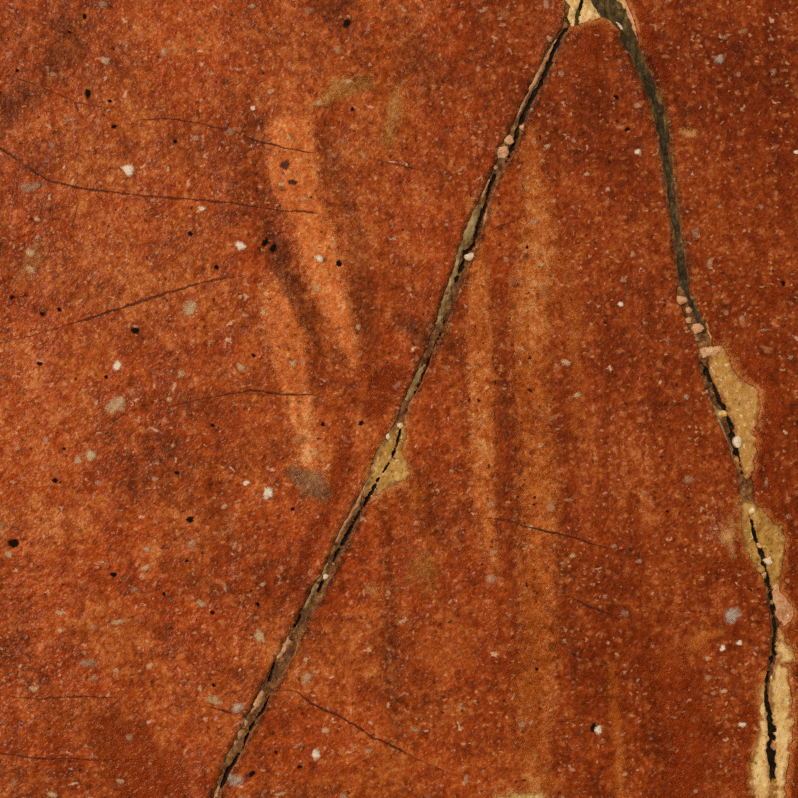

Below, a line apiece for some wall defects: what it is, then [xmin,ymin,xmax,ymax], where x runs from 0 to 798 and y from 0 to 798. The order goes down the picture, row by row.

crack [138,118,315,153]
crack [154,389,326,410]
rust [290,422,351,588]
flaking render [359,420,414,501]
crack [204,0,796,798]
flaking render [709,340,764,480]
rust [86,718,188,798]
flaking render [492,785,549,798]
rust [607,662,627,798]
rust [640,628,723,798]
flaking render [734,494,798,798]